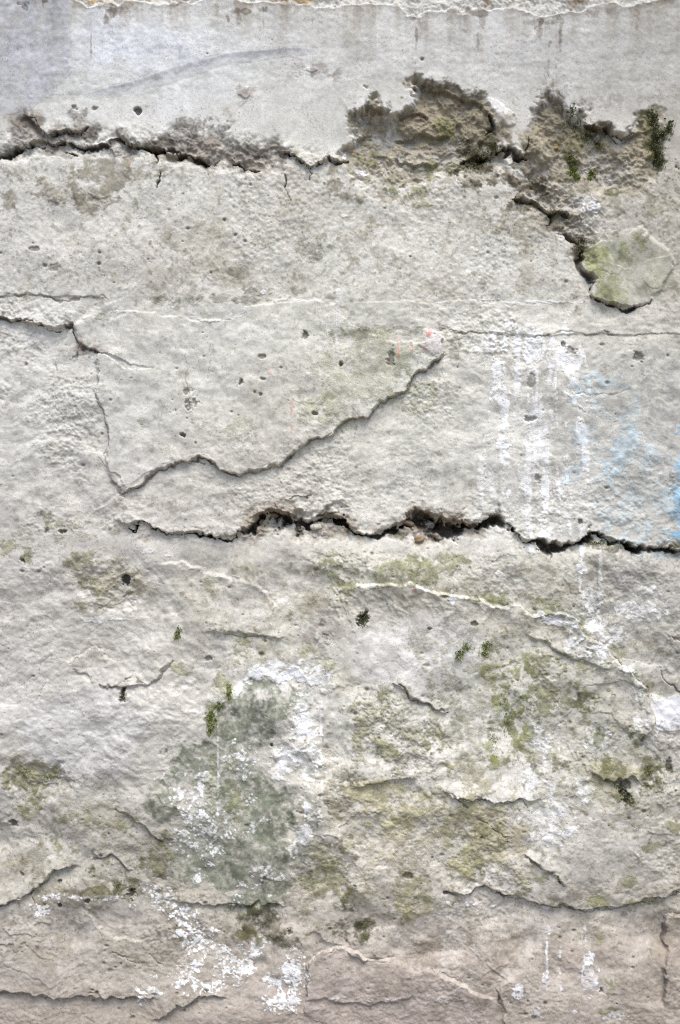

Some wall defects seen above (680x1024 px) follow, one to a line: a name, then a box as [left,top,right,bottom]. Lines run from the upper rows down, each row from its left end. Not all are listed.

crack [0,115,349,198]
spalling [336,73,675,308]
crack [0,196,680,498]
crack [129,494,675,559]
damp [153,656,336,884]
damp [231,862,288,909]
damp [24,883,680,1024]
crack [443,792,680,1002]